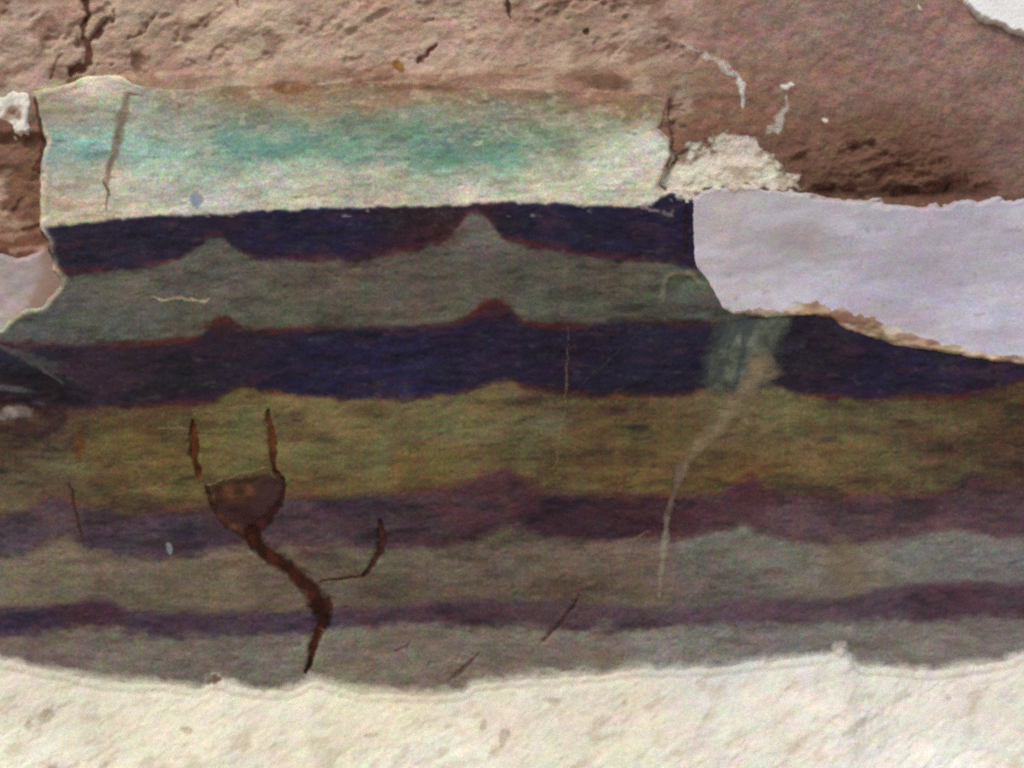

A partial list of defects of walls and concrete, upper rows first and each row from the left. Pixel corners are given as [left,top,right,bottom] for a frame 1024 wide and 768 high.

crack [32,0,153,171]
crack [102,92,129,207]
spalling [811,173,856,192]
spalling [847,138,875,152]
spalling [869,162,923,177]
spalling [889,172,961,197]
spalling [723,301,1024,364]
damp [658,314,788,597]